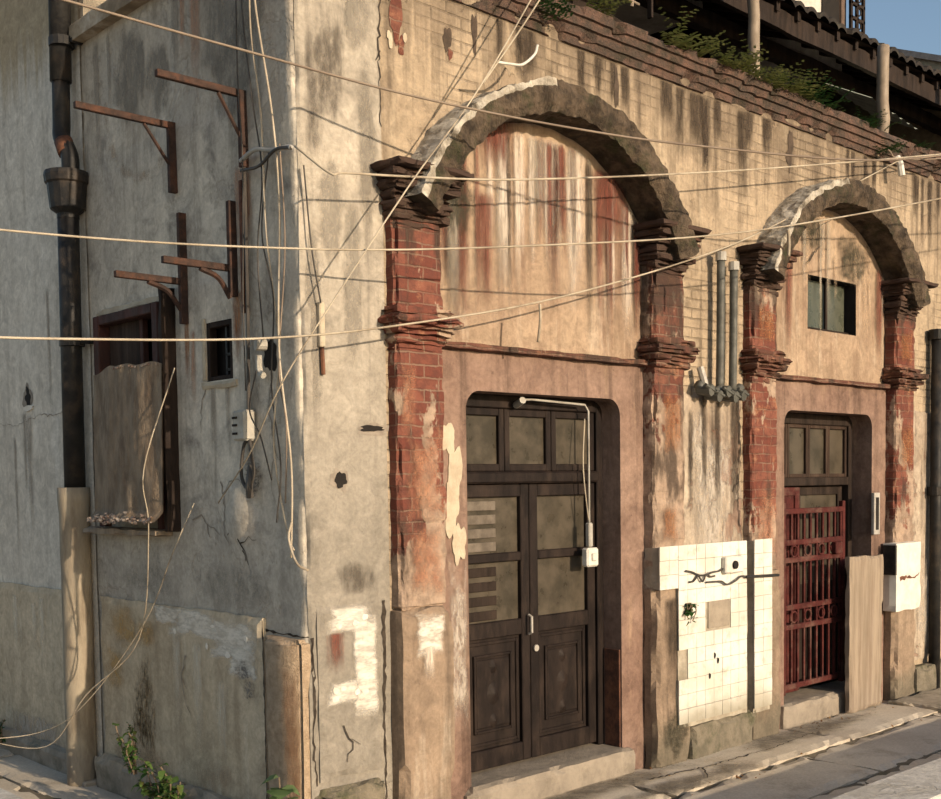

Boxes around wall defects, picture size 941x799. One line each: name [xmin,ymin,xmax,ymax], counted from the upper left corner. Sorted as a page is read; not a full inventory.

spalling [386,0,407,55]
leakage [442,136,642,306]
crack [192,479,252,563]
spalling [443,423,467,566]
leakage [689,400,738,543]
peeling [155,606,255,678]
peeling [331,608,378,709]